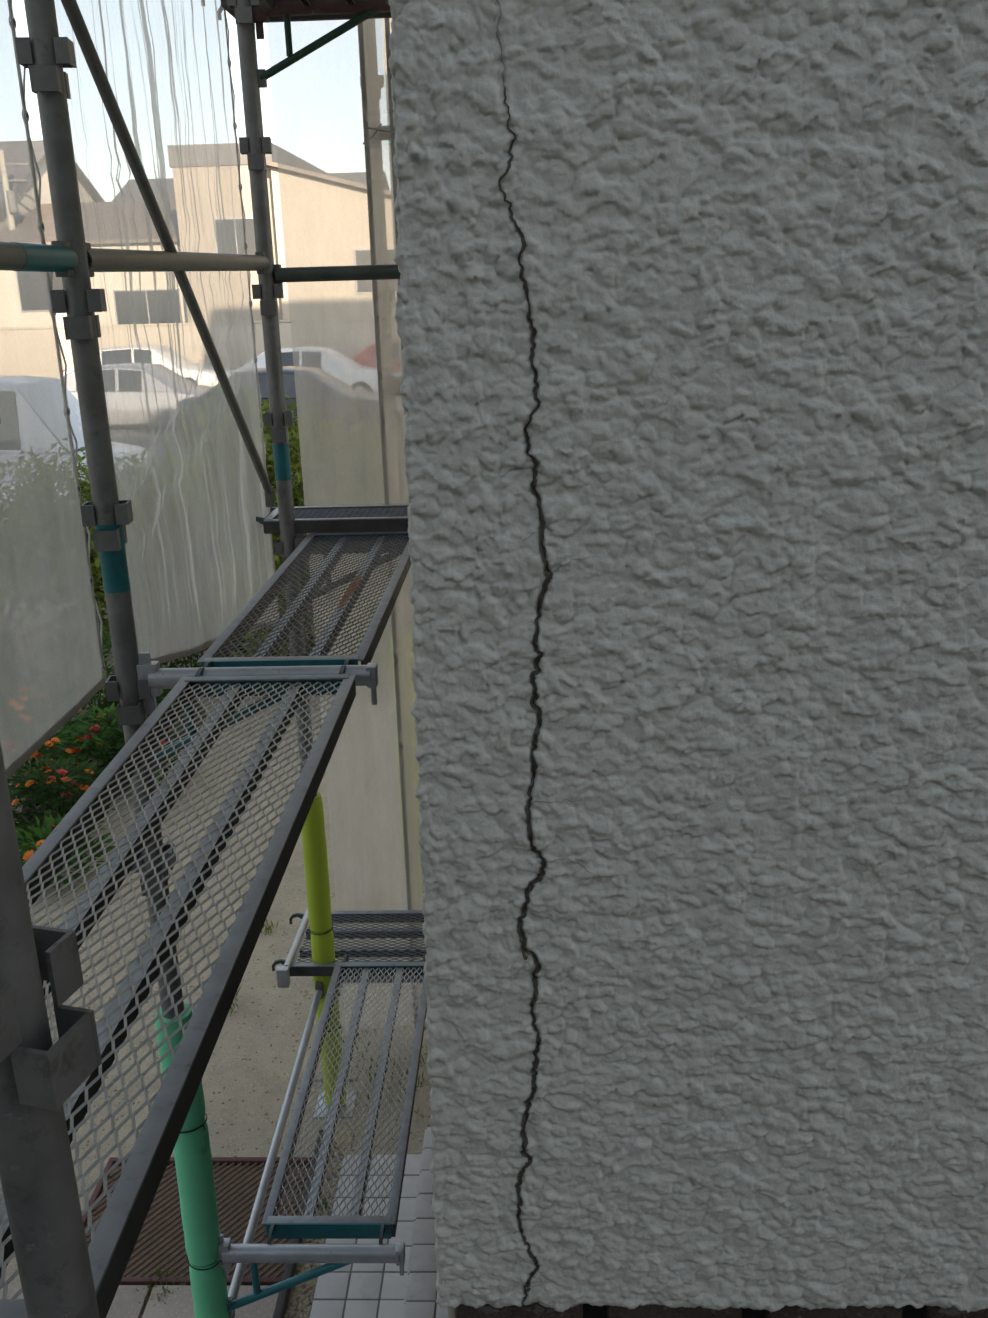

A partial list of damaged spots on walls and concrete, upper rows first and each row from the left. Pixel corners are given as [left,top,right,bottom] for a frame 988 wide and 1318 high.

crack [496,0,600,1306]